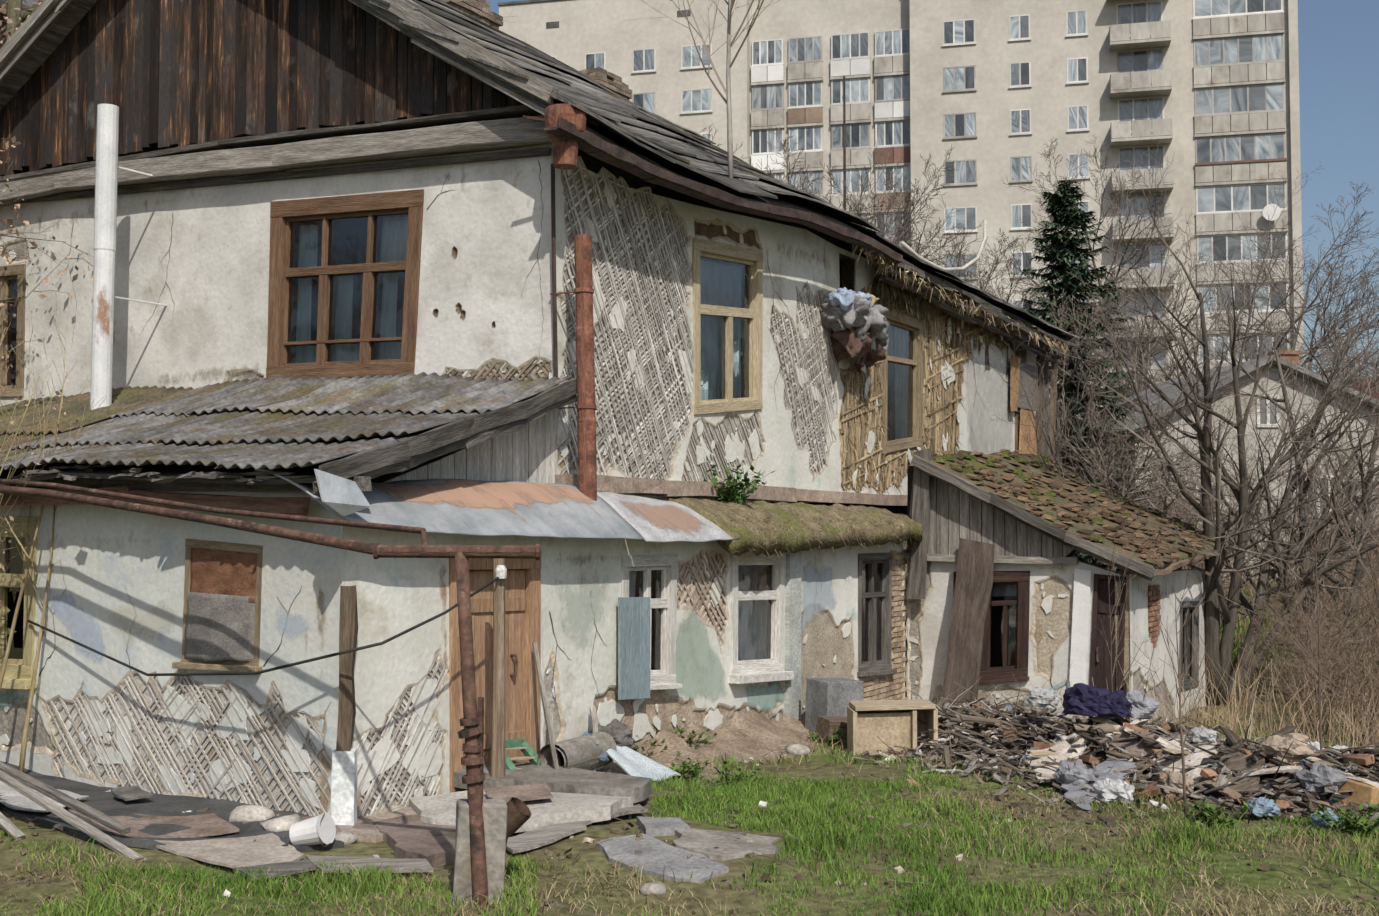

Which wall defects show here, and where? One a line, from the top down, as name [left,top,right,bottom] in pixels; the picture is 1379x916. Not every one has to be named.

rust [98,293,114,339]
flaking render [442,156,766,485]
flaking render [768,275,1017,495]
rust [372,479,592,513]
rust [622,501,702,532]
flaking render [593,549,961,754]
flaking render [978,575,1073,710]
flaking render [0,669,332,816]
flaking render [352,646,450,817]